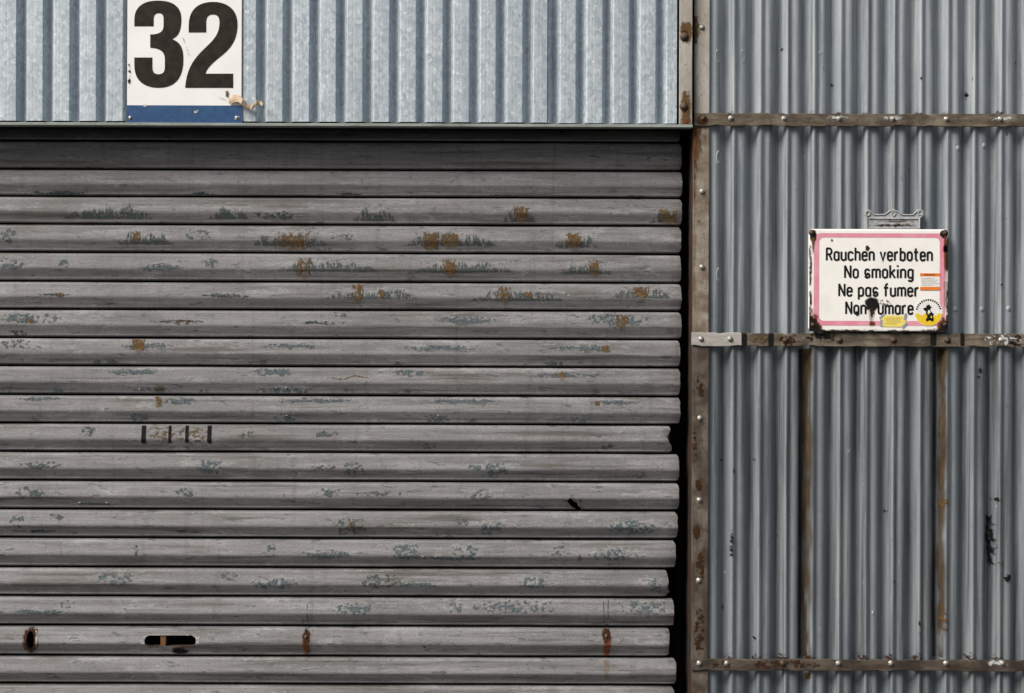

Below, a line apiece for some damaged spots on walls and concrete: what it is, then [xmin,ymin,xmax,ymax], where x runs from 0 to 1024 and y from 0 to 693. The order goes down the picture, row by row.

rust [602,600,611,655]